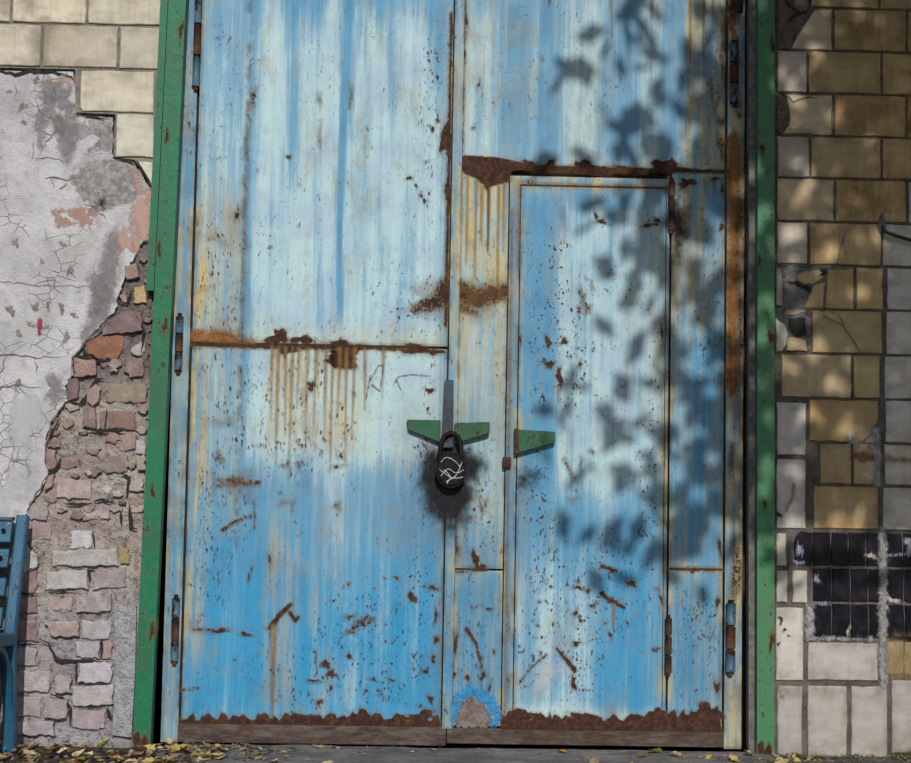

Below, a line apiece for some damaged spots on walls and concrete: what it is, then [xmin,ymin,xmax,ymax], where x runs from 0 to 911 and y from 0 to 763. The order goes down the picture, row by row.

crack [0,279,108,288]
corrosion [389,3,523,326]
corrosion [679,130,745,394]
spalling [776,94,819,134]
spalling [775,266,854,352]
crack [0,313,116,510]
spalling [17,170,161,748]
corrosion [189,229,357,600]
corrosion [669,537,742,601]
peeling [805,527,911,689]